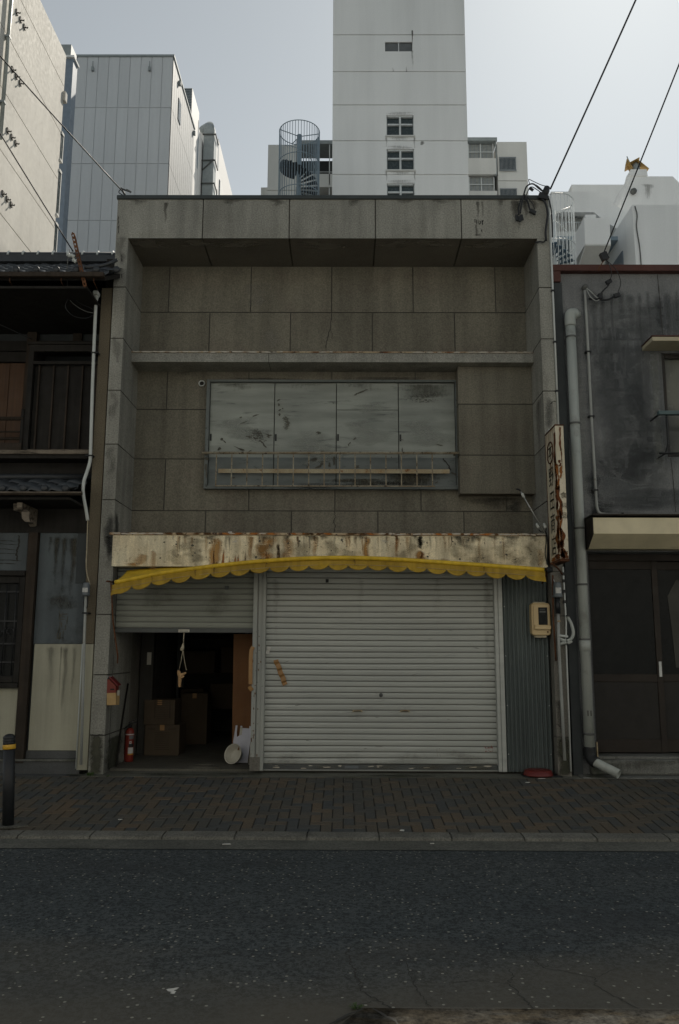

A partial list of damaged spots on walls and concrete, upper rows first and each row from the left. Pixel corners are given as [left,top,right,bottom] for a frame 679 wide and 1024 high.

rust [165,532,333,564]
rust [346,533,398,556]